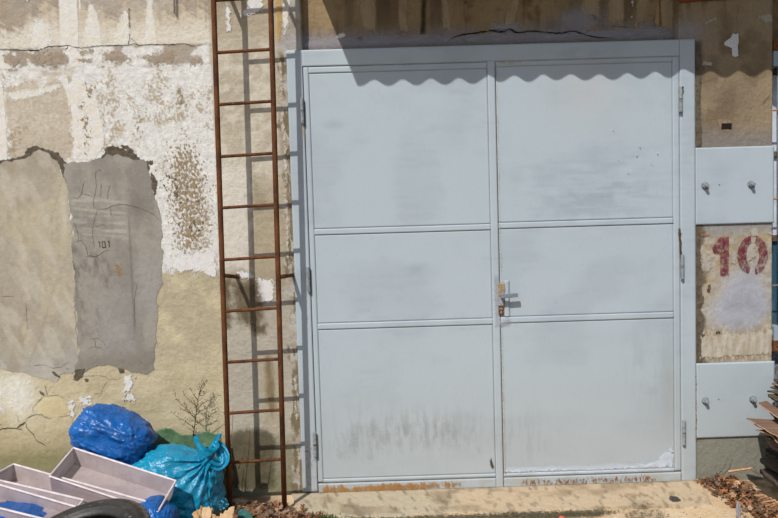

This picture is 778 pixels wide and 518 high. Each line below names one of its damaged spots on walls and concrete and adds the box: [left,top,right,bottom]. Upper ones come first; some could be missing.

leakage [29,0,103,68]
leakage [113,10,131,46]
leakage [143,0,157,45]
crack [447,26,622,43]
peeling [724,33,739,57]
leakage [0,55,105,160]
flaking render [0,145,66,183]
peeling [730,228,772,265]
peeling [696,226,713,362]
crack [0,387,73,446]
rust [323,481,460,493]
rust [521,474,656,486]